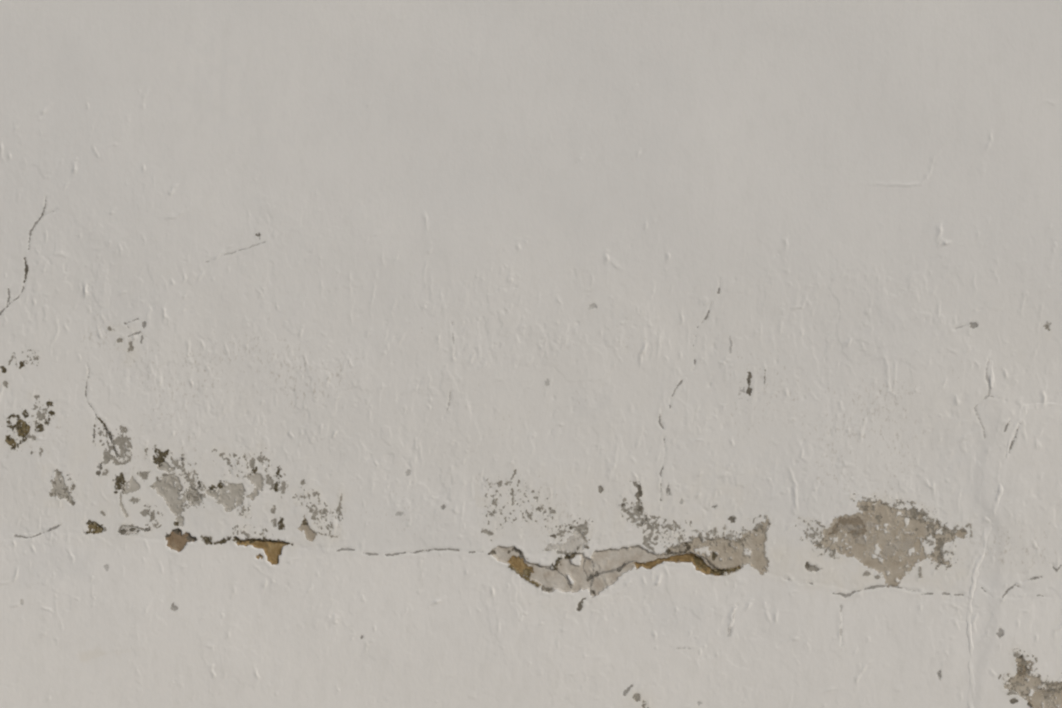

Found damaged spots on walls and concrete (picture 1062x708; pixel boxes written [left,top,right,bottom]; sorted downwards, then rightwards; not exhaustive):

crack [14,525,60,538]
peeling [86,446,343,565]
crack [337,548,475,556]
flaking render [488,515,771,611]
crack [810,583,902,598]
peeling [795,493,972,587]
crack [927,567,1060,598]
peeling [998,650,1062,708]